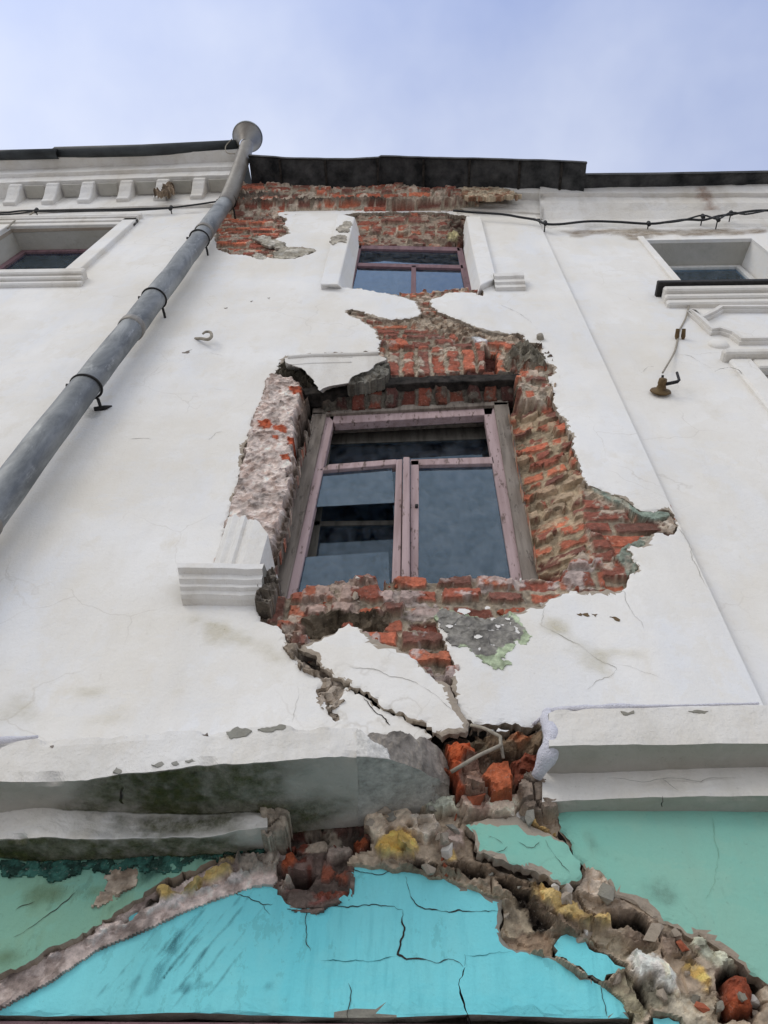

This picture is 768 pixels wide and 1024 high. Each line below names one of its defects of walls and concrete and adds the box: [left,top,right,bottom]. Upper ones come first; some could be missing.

flaking render [216,214,315,260]
peeling [329,221,353,245]
flaking render [222,362,312,576]
peeling [590,487,676,575]
crack [283,638,506,750]
peeling [412,606,532,670]
leakage [0,763,280,883]
flaking render [0,850,303,1011]
crack [305,869,503,1024]
flaking render [347,730,768,1024]